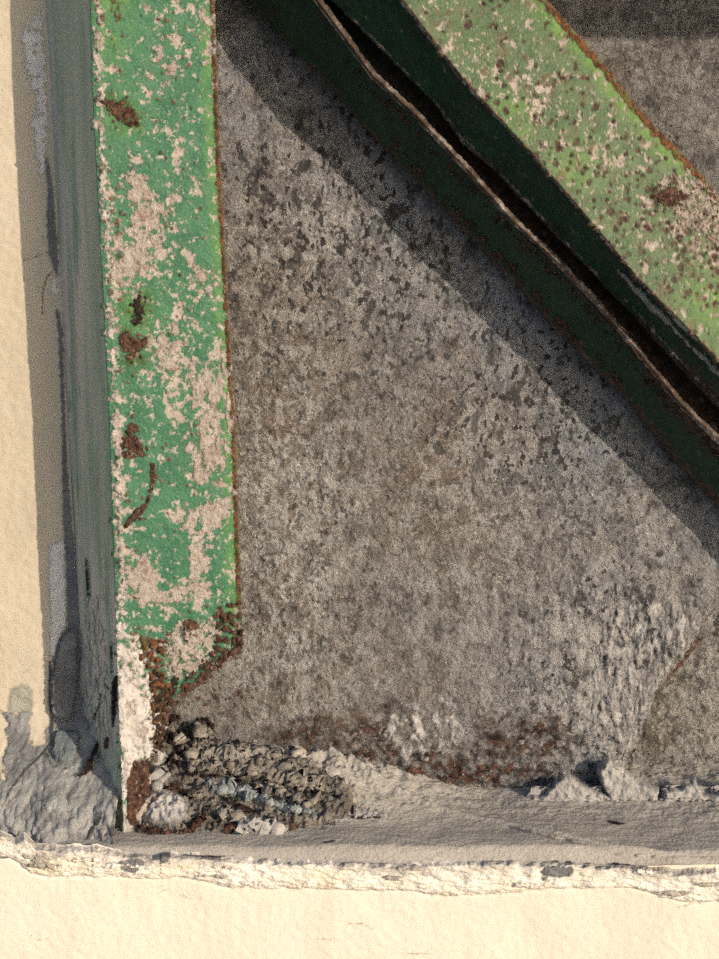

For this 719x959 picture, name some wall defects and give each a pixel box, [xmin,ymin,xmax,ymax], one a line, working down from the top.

corrosion [94,93,140,128]
corrosion [539,0,716,213]
peeling [92,0,179,340]
peeling [658,168,719,247]
corrosion [119,295,148,364]
peeling [187,260,226,296]
corrosion [116,414,159,528]
corrosion [127,0,259,835]
peeling [154,314,234,487]
spalling [0,347,719,903]
corrosion [472,716,577,760]